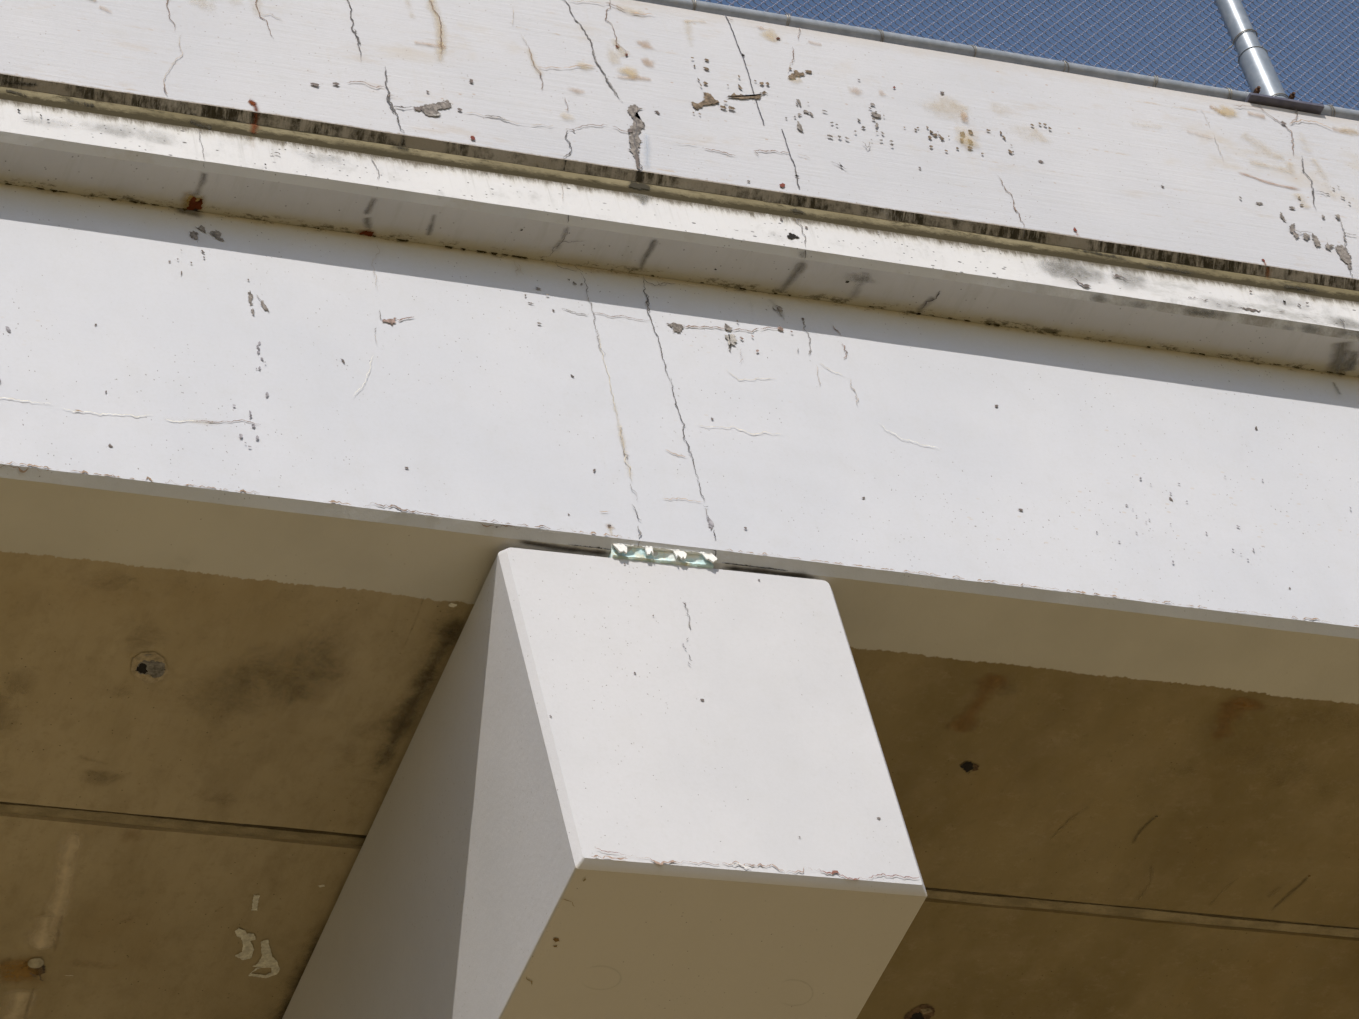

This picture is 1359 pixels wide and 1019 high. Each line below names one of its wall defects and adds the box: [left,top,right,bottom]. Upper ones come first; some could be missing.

crack [163,0,183,93]
crack [311,0,413,131]
crack [429,0,443,49]
peeling [414,90,462,117]
spalling [627,104,660,169]
crack [1200,103,1335,204]
corrosion [177,195,203,216]
crack [353,156,412,396]
crack [467,0,777,556]
spalling [131,652,168,683]